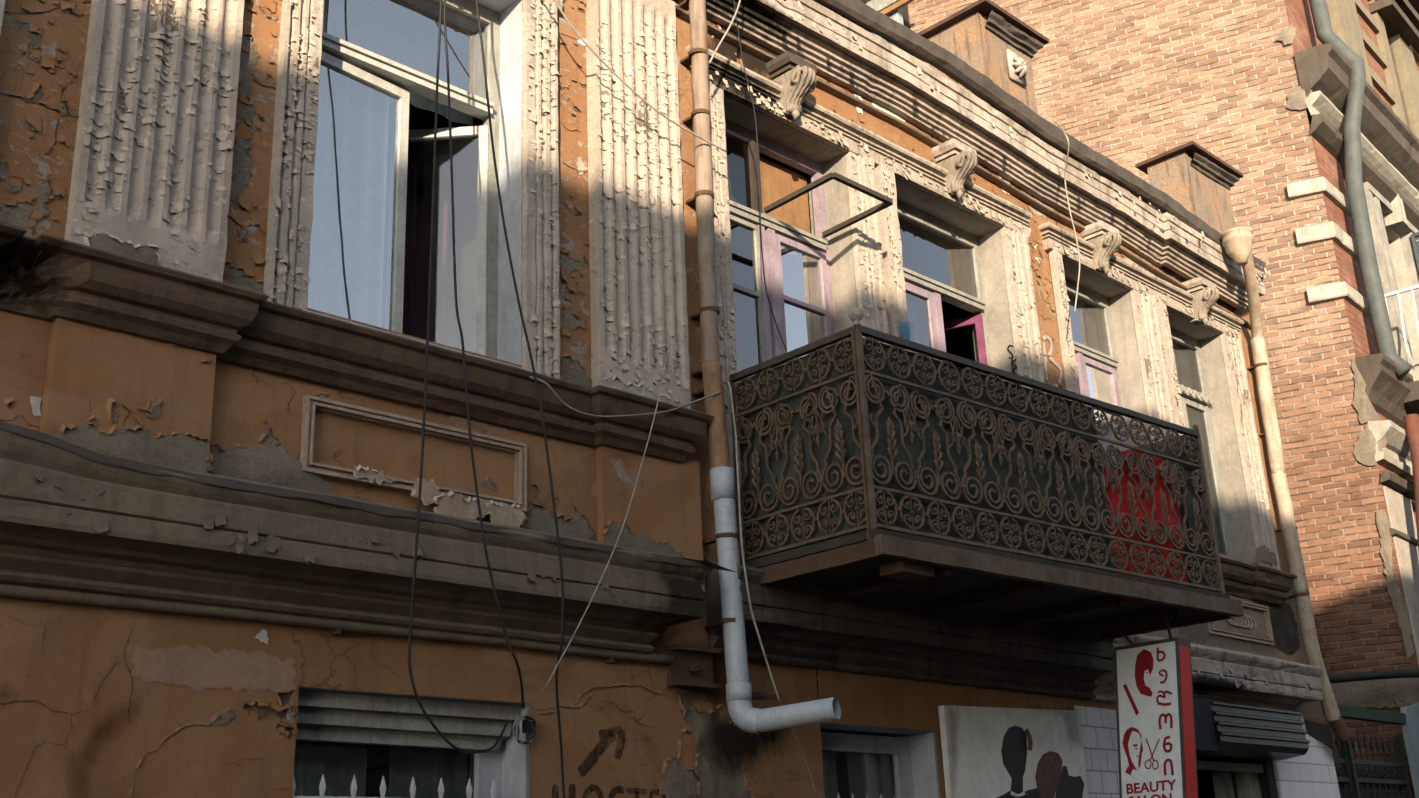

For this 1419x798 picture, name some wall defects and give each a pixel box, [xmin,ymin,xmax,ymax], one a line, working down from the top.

peeling [784,0,863,51]
peeling [917,67,1018,140]
peeling [527,0,689,409]
peeling [709,71,787,425]
peeling [805,94,1095,400]
peeling [1112,188,1205,244]
peeling [0,396,41,421]
peeling [51,397,214,473]
peeling [204,513,281,554]
crack [0,631,213,795]
spalling [659,688,756,798]